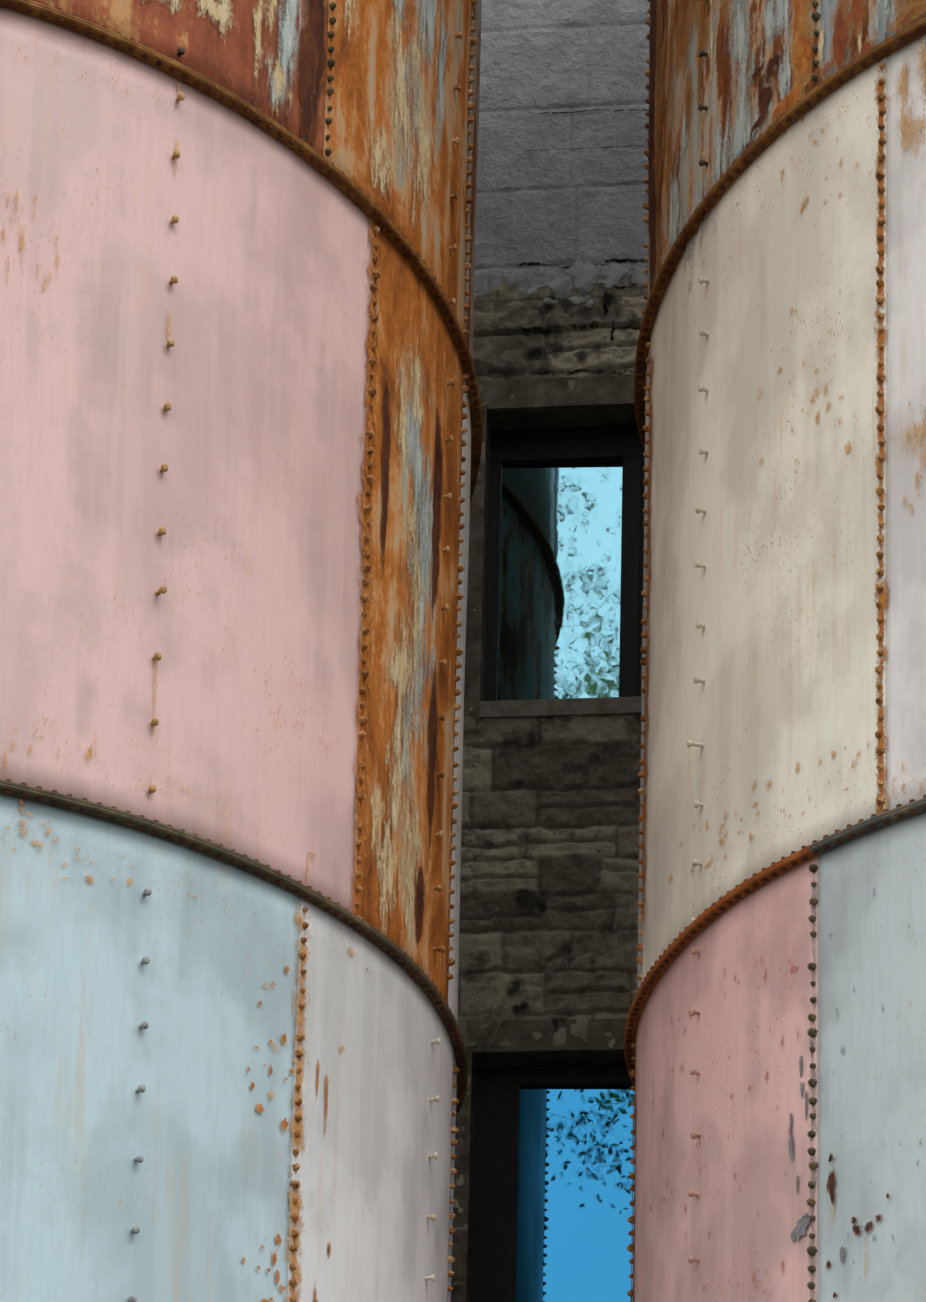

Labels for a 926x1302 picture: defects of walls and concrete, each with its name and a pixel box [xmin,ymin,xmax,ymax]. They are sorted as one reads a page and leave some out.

peeling [198,0,231,32]
peeling [254,0,308,105]
corrosion [298,0,331,147]
crack [518,368,634,376]
peeling [508,254,648,316]
crack [519,258,646,340]
corrosion [741,0,926,829]
corrosion [353,217,394,896]
corrosion [432,407,443,621]
corrosion [428,662,438,849]
corrosion [414,864,425,943]
corrosion [809,1153,835,1299]